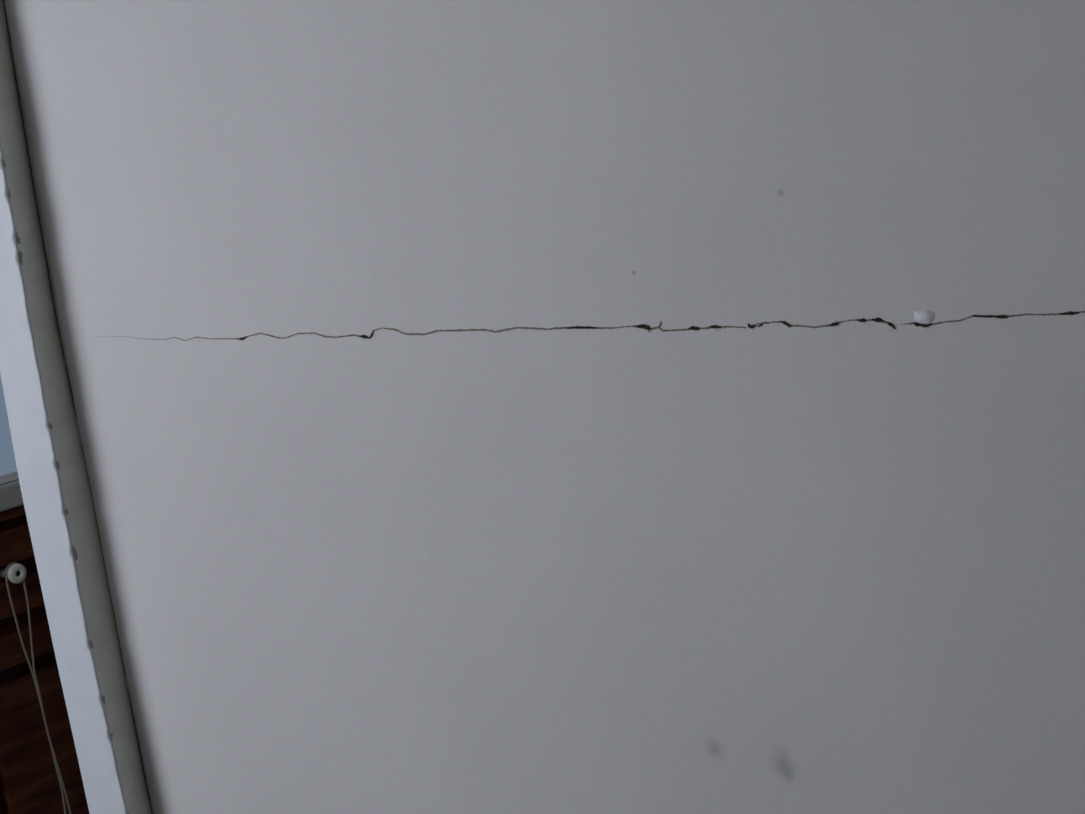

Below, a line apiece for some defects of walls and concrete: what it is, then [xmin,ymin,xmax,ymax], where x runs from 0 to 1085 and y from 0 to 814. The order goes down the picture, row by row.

crack [109,311,1085,342]